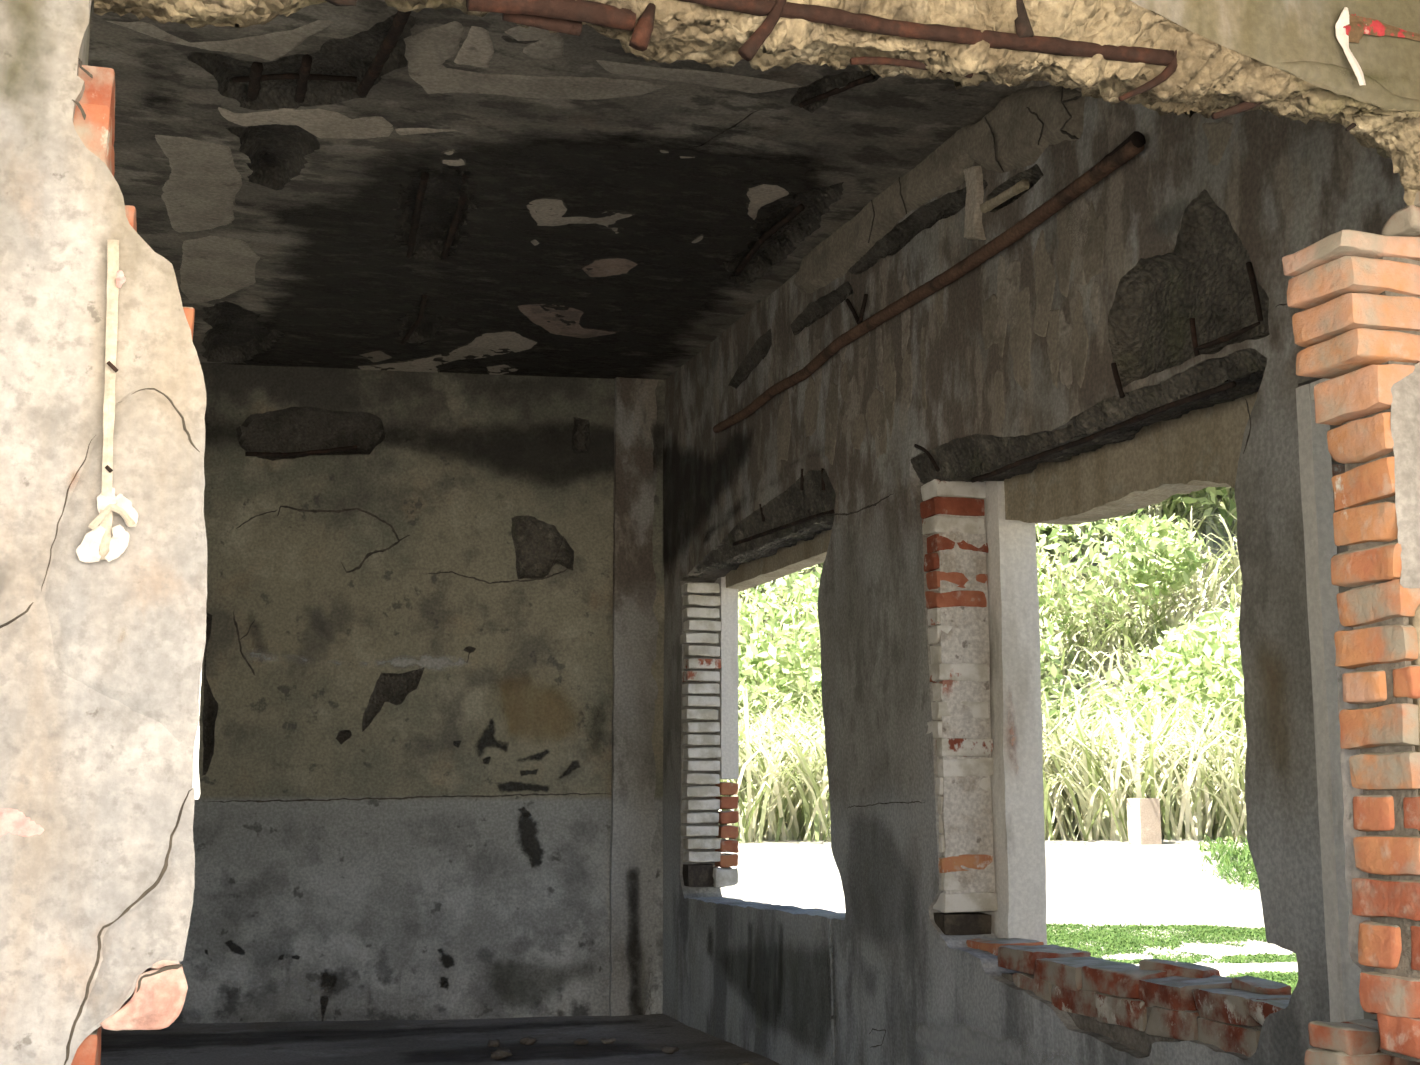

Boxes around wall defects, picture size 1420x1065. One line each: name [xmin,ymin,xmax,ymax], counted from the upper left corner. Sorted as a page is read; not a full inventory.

spalling [94,0,1420,364]
crack [119,388,200,452]
spalling [238,407,385,461]
peeling [358,304,615,375]
spalling [911,189,1270,484]
crack [0,435,96,628]
peeling [45,389,218,794]
flaking render [336,667,425,745]
flaking render [511,515,574,579]
peeling [1408,604,1420,666]
peeling [79,839,195,1032]
crack [64,788,612,1065]